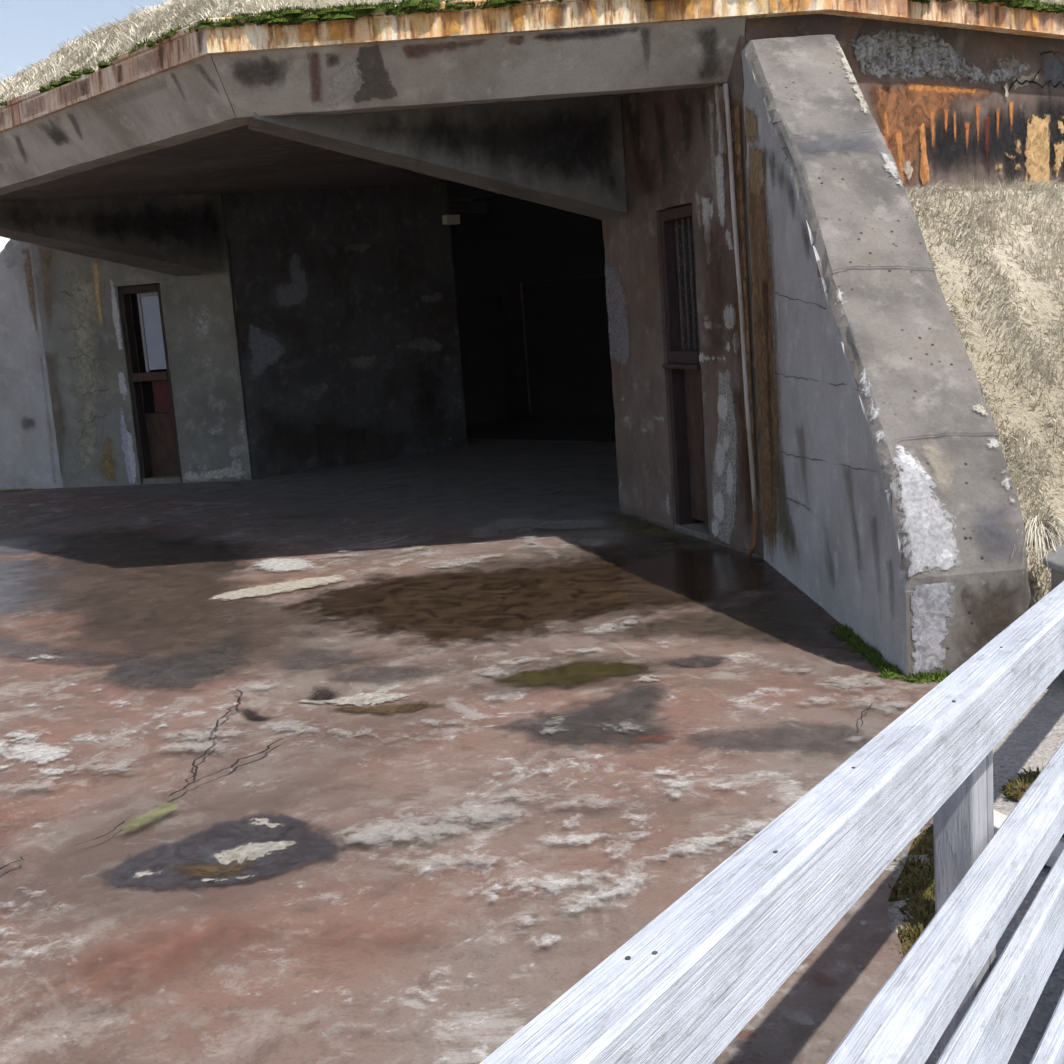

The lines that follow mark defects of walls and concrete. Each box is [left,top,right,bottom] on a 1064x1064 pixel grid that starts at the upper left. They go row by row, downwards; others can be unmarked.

rust [296,19,354,101]
rust [403,10,485,57]
rust [509,0,597,45]
spalling [838,28,1039,113]
crack [998,51,1064,92]
spalling [882,153,901,184]
rust [871,85,1013,183]
rust [704,96,780,549]
peeling [699,305,740,545]
spalling [876,431,960,674]
leakage [0,532,421,688]
crack [168,687,283,797]